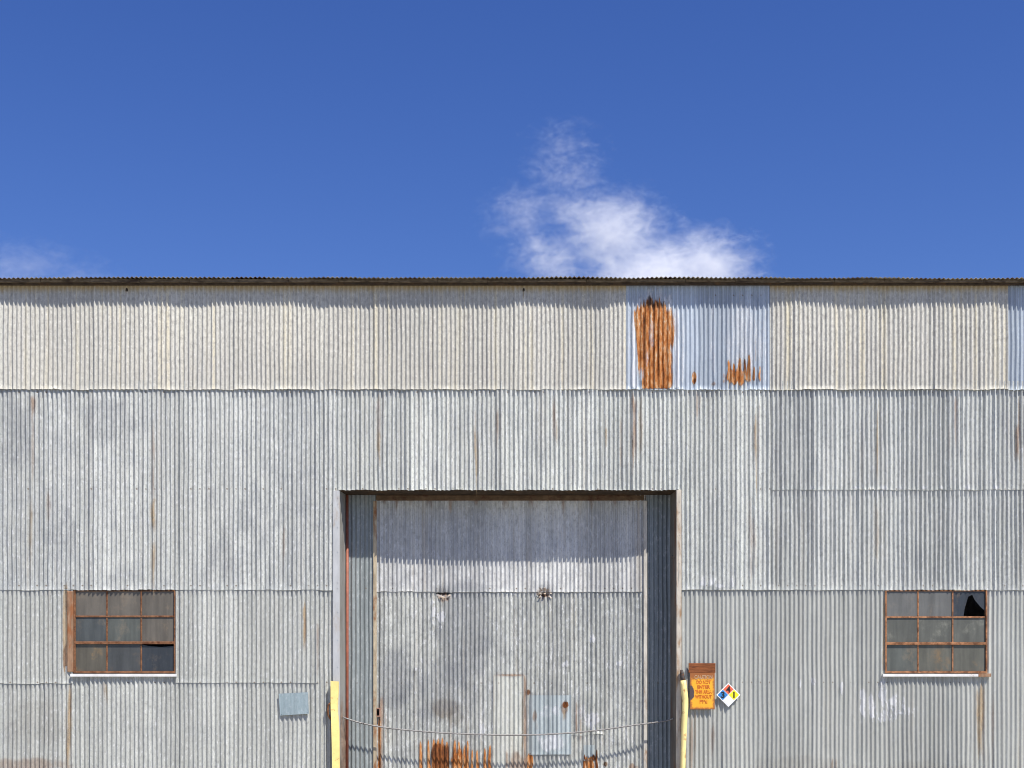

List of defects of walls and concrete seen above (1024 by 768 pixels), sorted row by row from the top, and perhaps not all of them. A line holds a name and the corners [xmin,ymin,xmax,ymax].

rust [627,288,679,411]
rust [727,308,762,385]
rust [419,738,491,768]
rust [583,750,607,768]